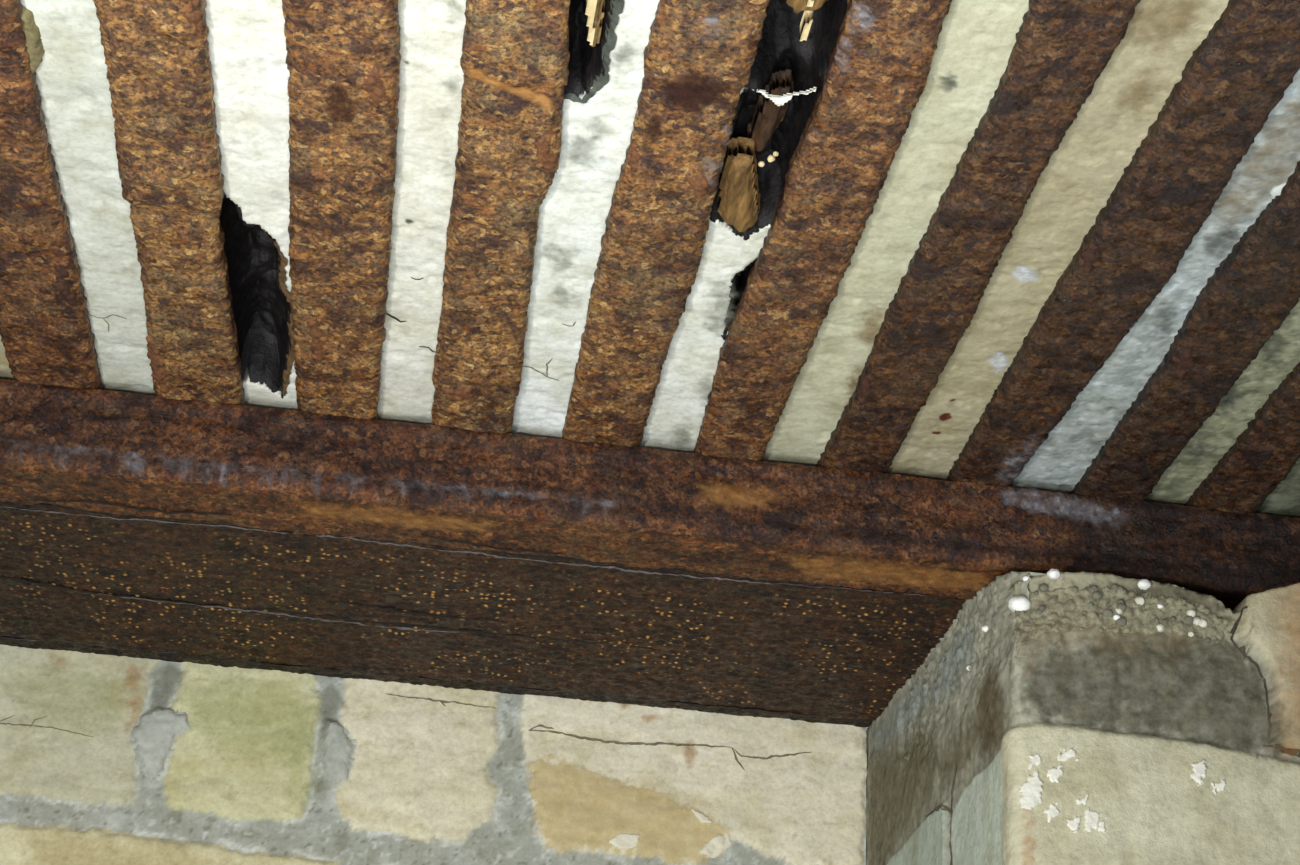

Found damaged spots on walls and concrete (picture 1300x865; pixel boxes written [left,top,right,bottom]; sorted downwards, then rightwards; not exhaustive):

corrosion [470,69,550,106]
spalling [564,0,624,104]
corrosion [628,121,661,173]
corrosion [666,75,728,113]
spalling [709,0,847,241]
hole [220,194,295,398]
corrosion [146,335,170,398]
crack [0,500,966,600]
leakage [1134,585,1220,615]
leakage [1025,634,1282,755]
crack [1230,606,1300,757]
crack [528,724,811,769]